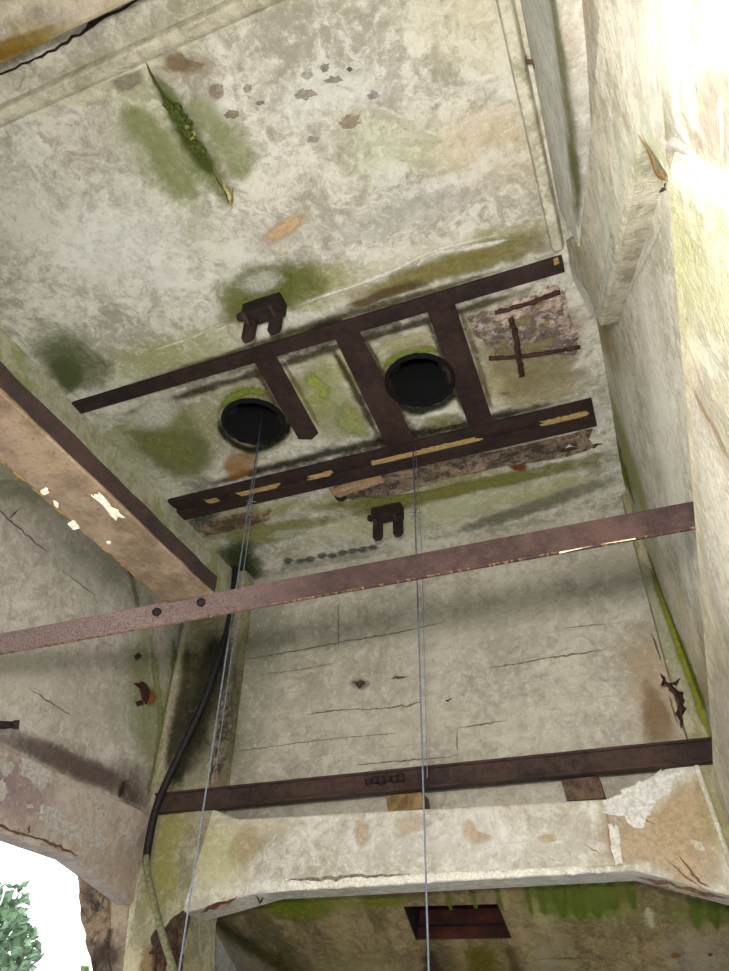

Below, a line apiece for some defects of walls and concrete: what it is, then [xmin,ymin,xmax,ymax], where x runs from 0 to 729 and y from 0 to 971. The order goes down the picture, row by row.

crack [0,0,138,75]
crack [126,62,248,209]
mould [49,345,108,391]
spalling [466,284,580,408]
crack [490,649,606,668]
leakage [167,640,228,786]
crack [357,720,506,765]
peeling [0,757,57,802]
flaking render [256,768,716,893]
spalling [140,911,191,971]
leakage [644,907,654,928]
crack [636,876,729,900]